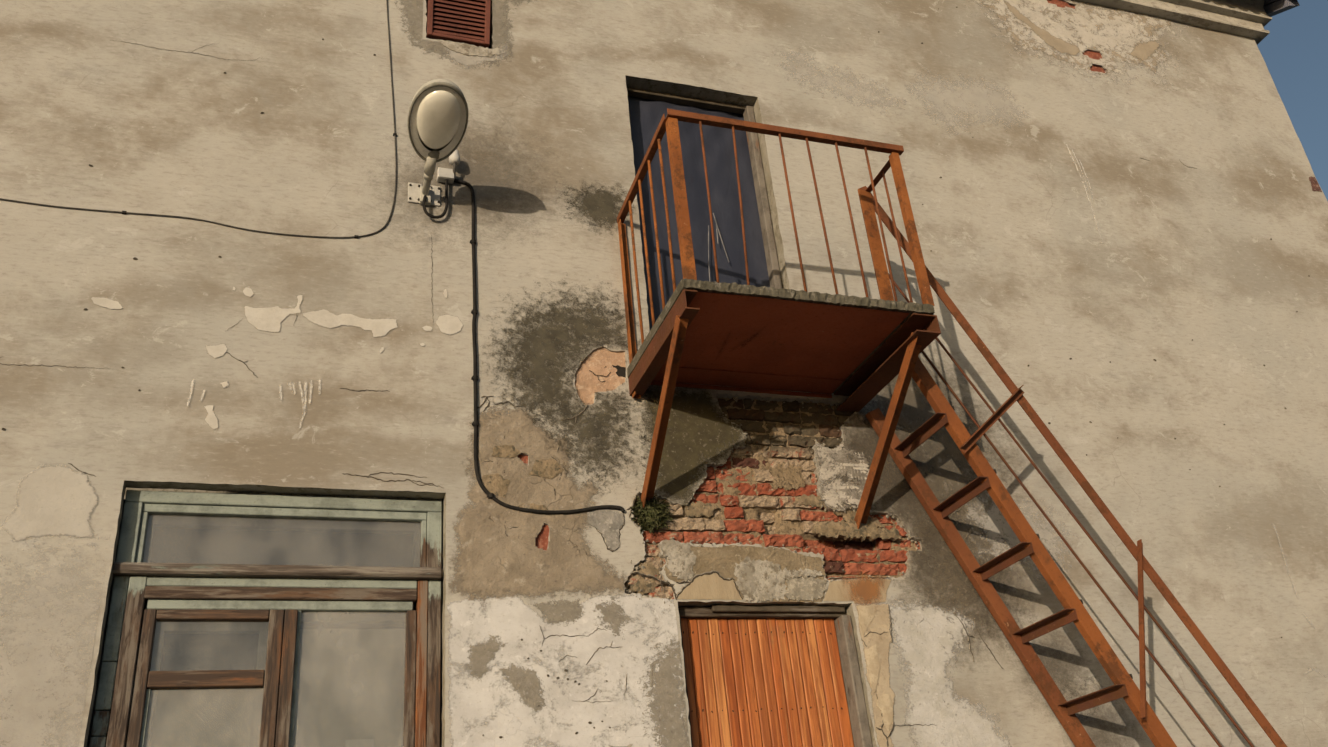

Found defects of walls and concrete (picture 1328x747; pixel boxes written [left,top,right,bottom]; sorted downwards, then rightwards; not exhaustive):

peeling [956,0,1194,95]
peeling [233,286,398,353]
peeling [420,314,463,346]
spalling [574,347,626,405]
peeling [447,390,1012,747]
crack [540,627,653,703]